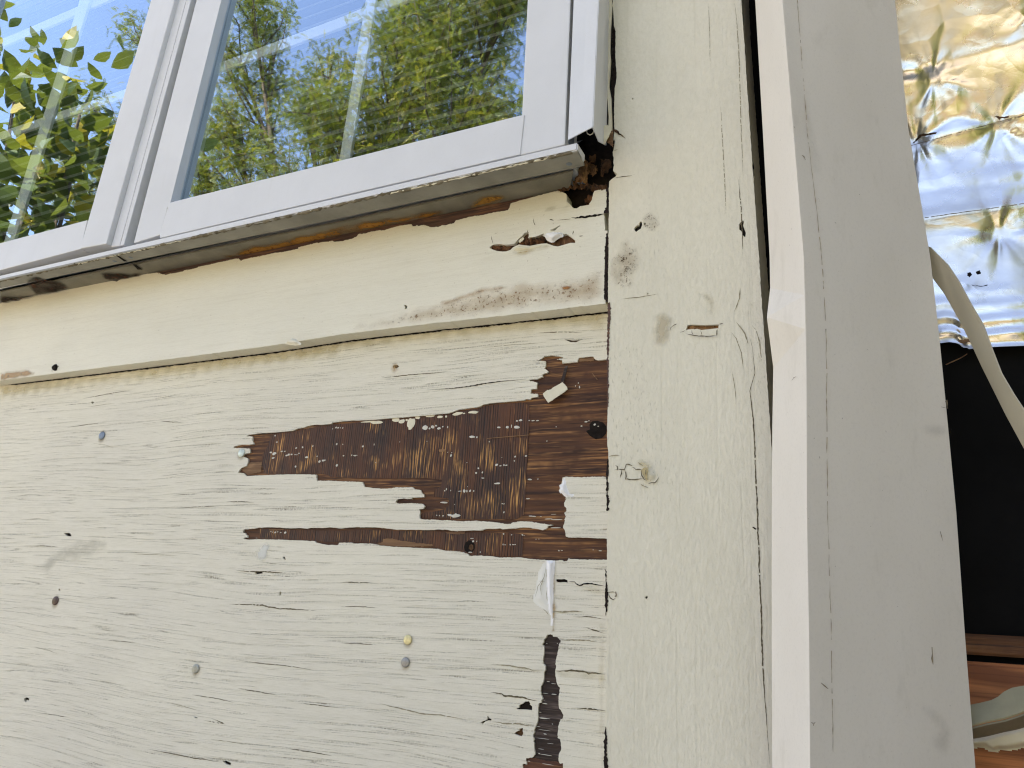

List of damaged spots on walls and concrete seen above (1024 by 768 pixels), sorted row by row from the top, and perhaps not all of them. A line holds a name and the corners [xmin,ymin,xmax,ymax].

spalling [557,128,625,208]
corrosion [228,229,343,257]
peeling [157,196,533,275]
spalling [495,232,575,252]
leakage [431,279,597,317]
peeling [235,356,609,768]
crack [235,603,314,611]
crack [555,569,608,642]
crack [492,664,601,675]
crack [150,690,275,762]
crack [491,692,535,726]
crack [581,708,608,768]